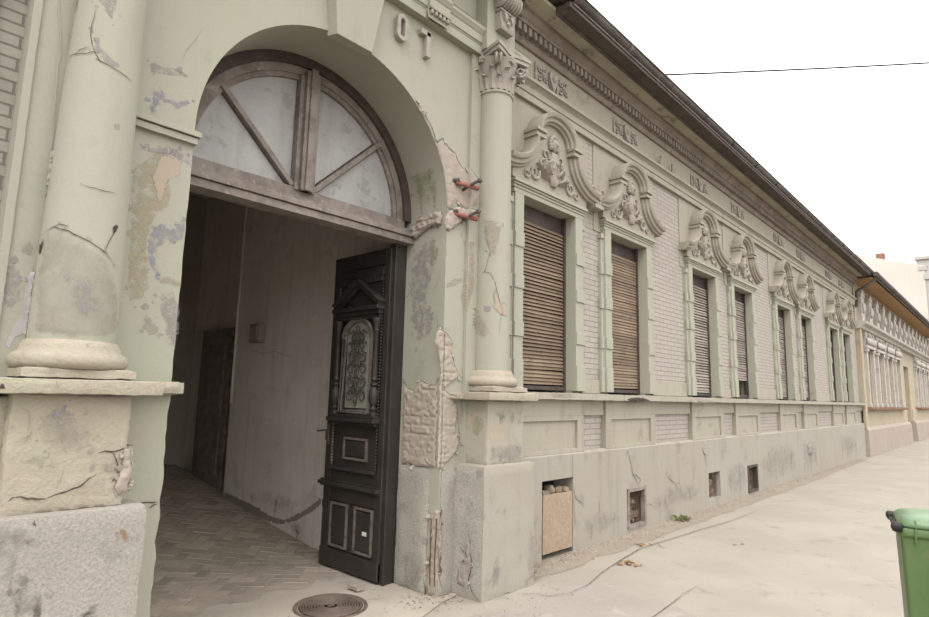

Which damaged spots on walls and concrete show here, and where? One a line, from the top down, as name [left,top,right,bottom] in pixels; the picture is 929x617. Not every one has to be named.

crack [68,2,131,81]
crack [42,224,117,267]
peeling [127,144,190,345]
flaking render [400,99,480,471]
crack [9,407,156,527]
flaking render [112,445,134,497]